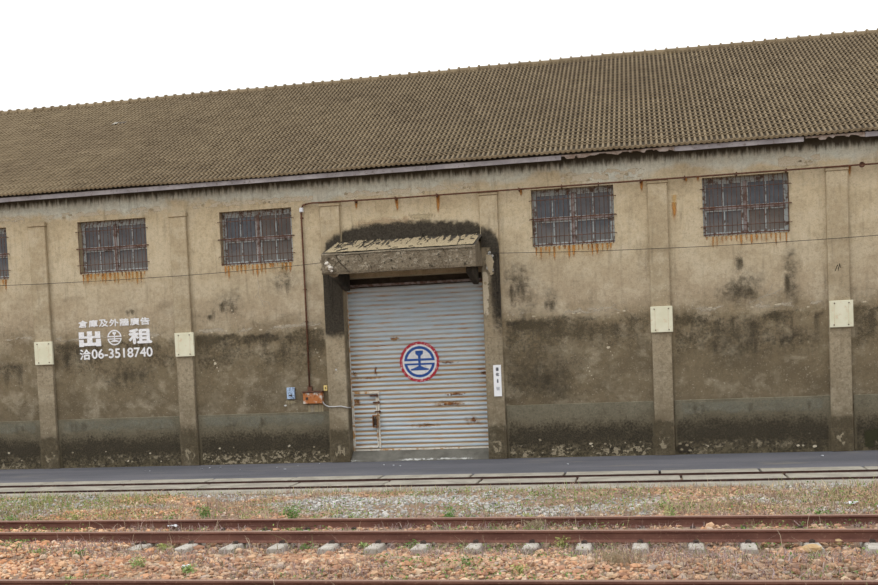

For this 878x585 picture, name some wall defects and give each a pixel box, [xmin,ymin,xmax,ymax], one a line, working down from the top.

spalling [319,233,478,277]
corrosion [536,243,612,258]
peeling [482,251,494,317]
damp [57,335,107,363]
damp [675,306,751,351]